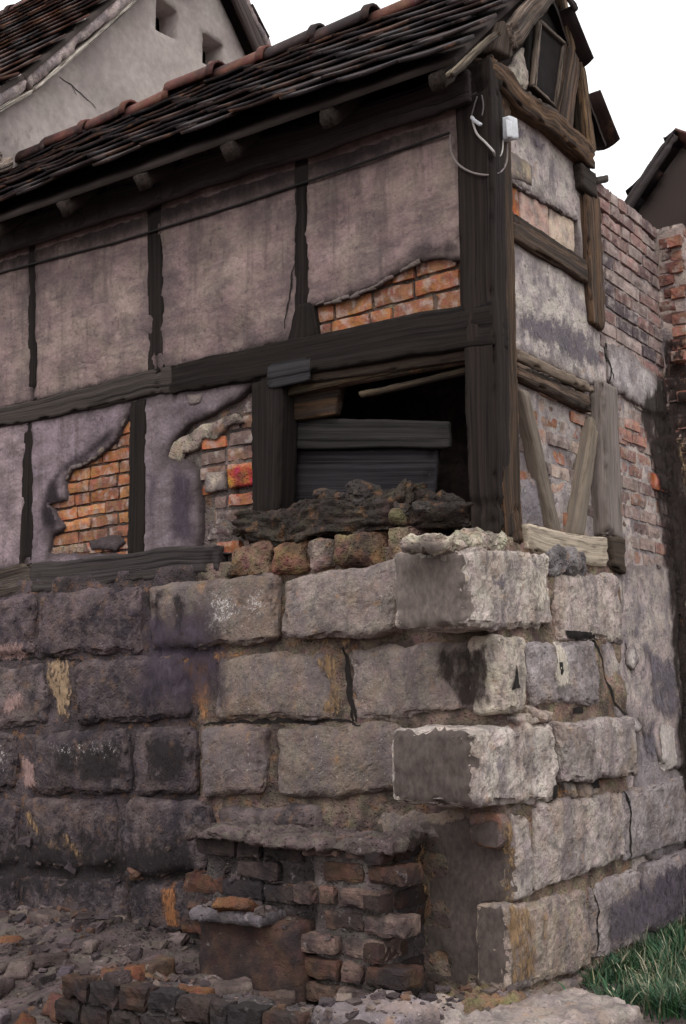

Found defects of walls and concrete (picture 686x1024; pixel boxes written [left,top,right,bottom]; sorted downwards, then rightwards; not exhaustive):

spalling [511,152,578,251]
spalling [315,259,460,334]
spalling [51,419,130,554]
spalling [168,392,253,562]
crack [574,635,627,715]